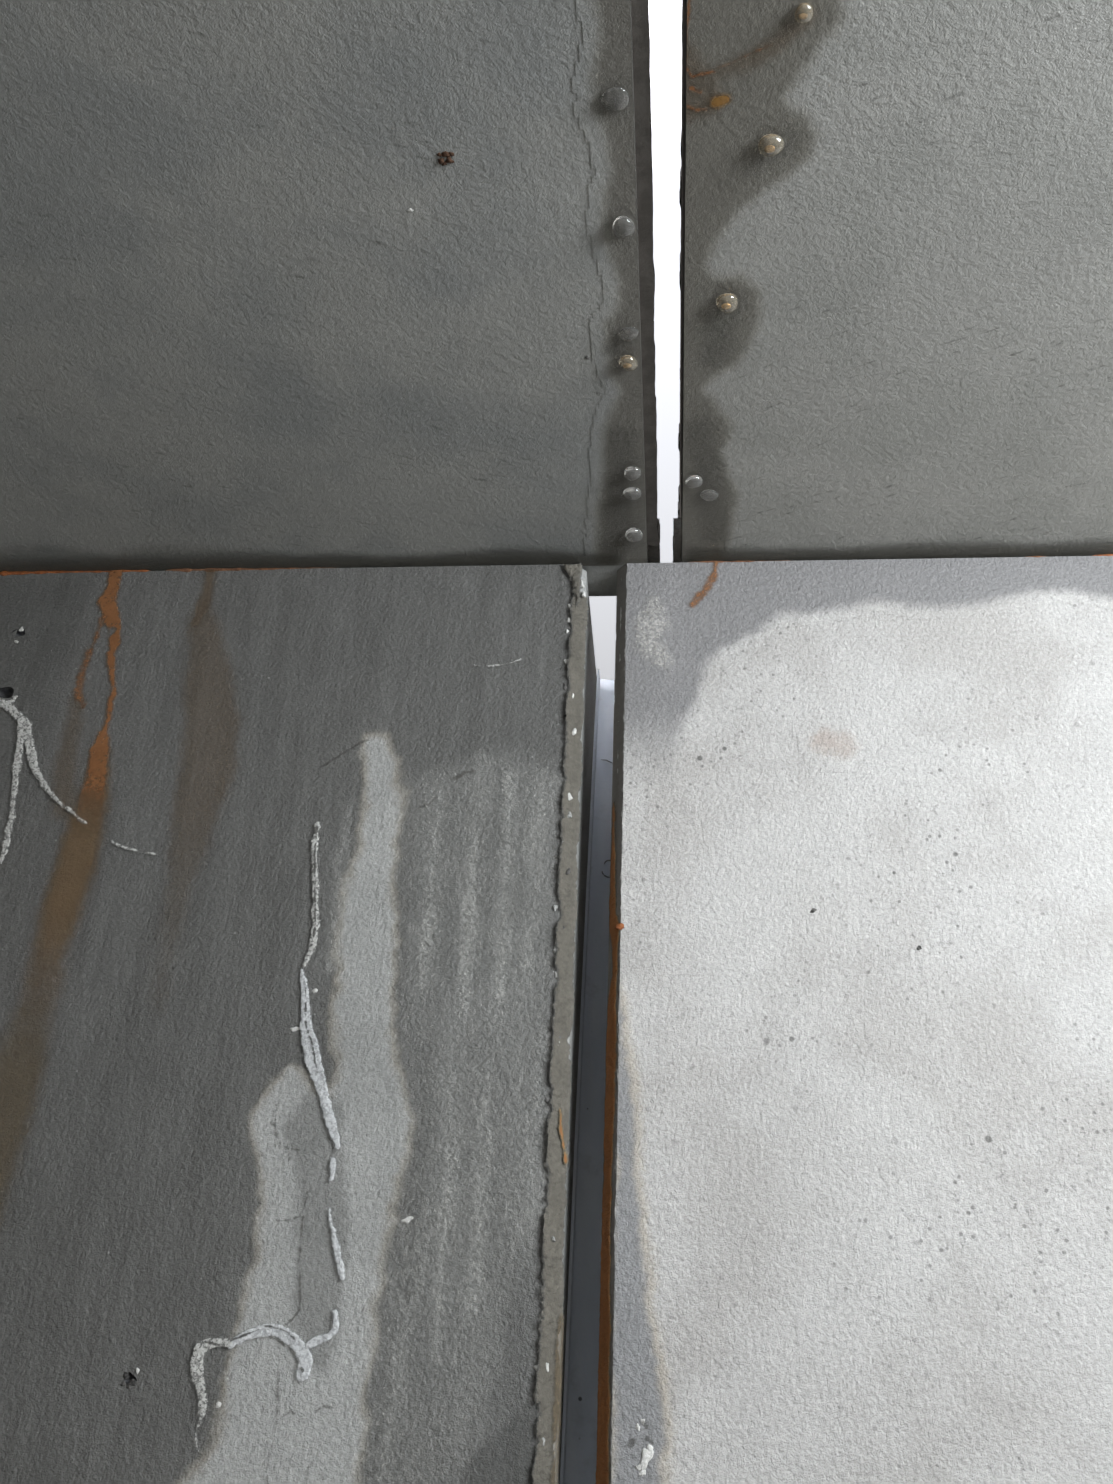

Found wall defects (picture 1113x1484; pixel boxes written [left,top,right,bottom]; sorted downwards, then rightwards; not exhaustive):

crack [0,699,156,864]
rust [0,567,318,959]
crack [190,822,345,1452]
water stain [0,553,617,1484]
rust [595,563,627,1484]
rust [690,560,754,607]
water stain [571,0,1113,805]